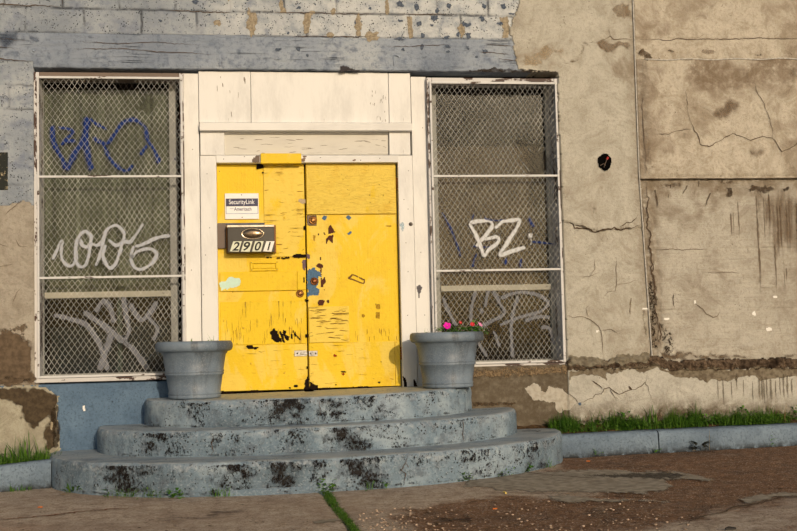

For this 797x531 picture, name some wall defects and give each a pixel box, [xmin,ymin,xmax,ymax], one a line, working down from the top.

peeling [296,3,316,34]
peeling [354,13,380,42]
spalling [394,3,451,51]
spalling [444,21,488,58]
peeling [497,4,515,38]
crack [670,82,797,152]
crack [565,187,702,352]
leakage [569,281,797,399]
peeling [525,383,581,413]
crack [571,381,654,402]
spalling [50,406,60,447]
leakage [102,391,555,496]